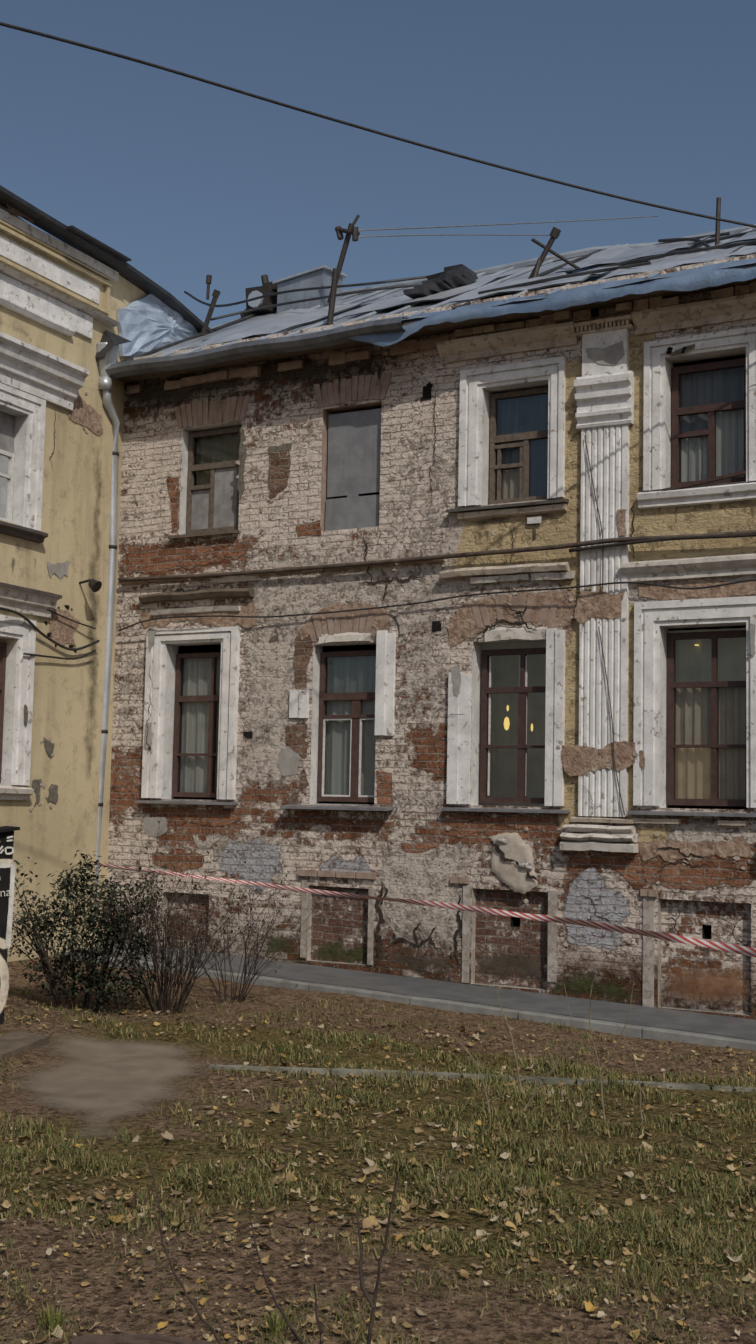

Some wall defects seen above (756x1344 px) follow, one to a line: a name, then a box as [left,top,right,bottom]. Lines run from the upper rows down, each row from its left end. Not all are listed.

flaking render [166,473,181,533]
flaking render [235,428,248,499]
spalling [264,443,292,503]
flaking render [139,601,258,652]
flaking render [288,597,390,690]
flaking render [432,574,756,647]
peeling [452,666,461,696]
flaking render [416,738,447,778]
flaking render [557,740,645,776]
flaking render [294,771,397,830]
flaking render [401,812,557,904]
crack [375,883,462,968]